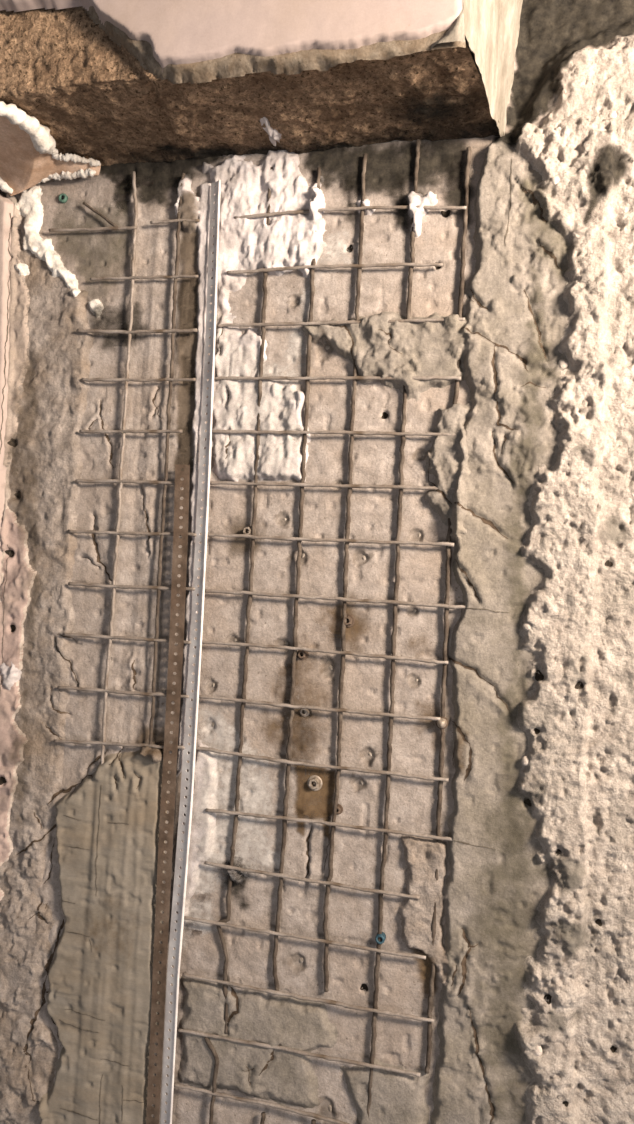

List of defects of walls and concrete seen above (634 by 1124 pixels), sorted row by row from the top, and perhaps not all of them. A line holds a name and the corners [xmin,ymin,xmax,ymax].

damp [493,0,634,146]
damp [393,175,409,229]
damp [584,144,628,224]
peeling [3,216,30,467]
peeling [88,299,104,317]
damp [92,304,144,347]
spalling [311,329,333,362]
crack [461,289,546,483]
crack [428,456,509,540]
corrosion [269,695,335,839]
crack [18,749,141,1102]
crack [451,928,495,1124]